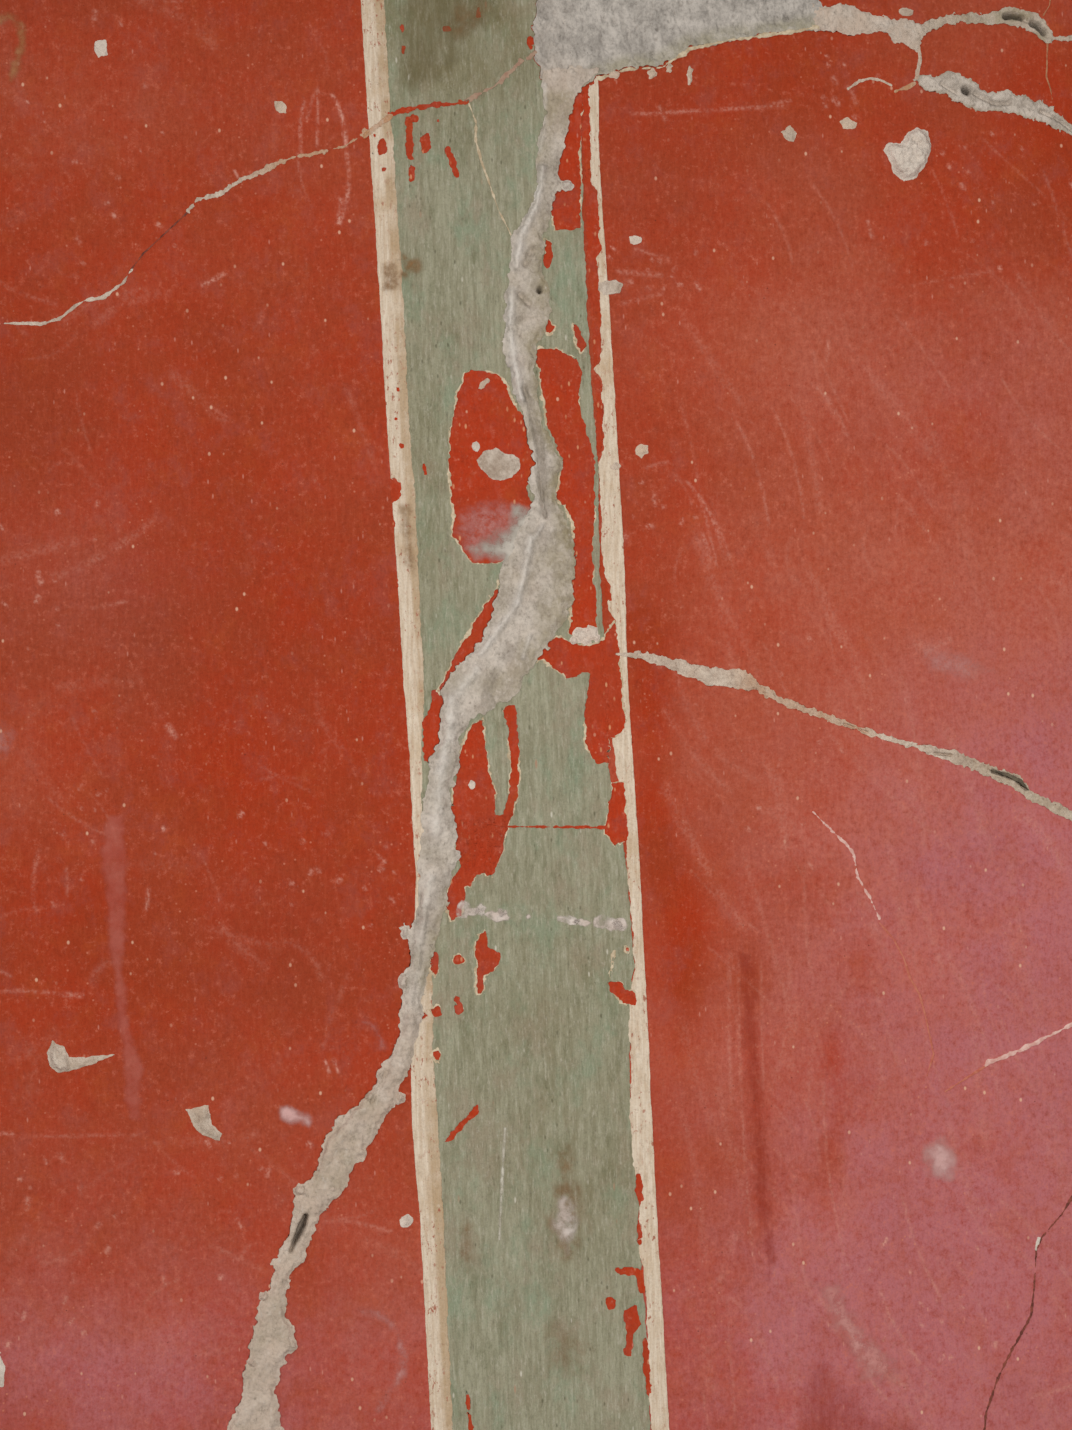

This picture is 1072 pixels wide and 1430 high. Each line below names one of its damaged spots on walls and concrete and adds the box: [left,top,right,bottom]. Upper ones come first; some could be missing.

crack [812,0,1072,135]
flaking render [527,0,823,764]
peeling [422,370,535,762]
crack [4,50,608,1430]
peeling [445,705,521,922]
peeling [603,781,629,847]
crack [616,651,1072,821]
flaking render [47,1040,115,1073]
peeling [422,929,501,1021]
crack [812,811,934,1076]
peeling [606,1267,652,1396]
crack [983,1196,1072,1430]